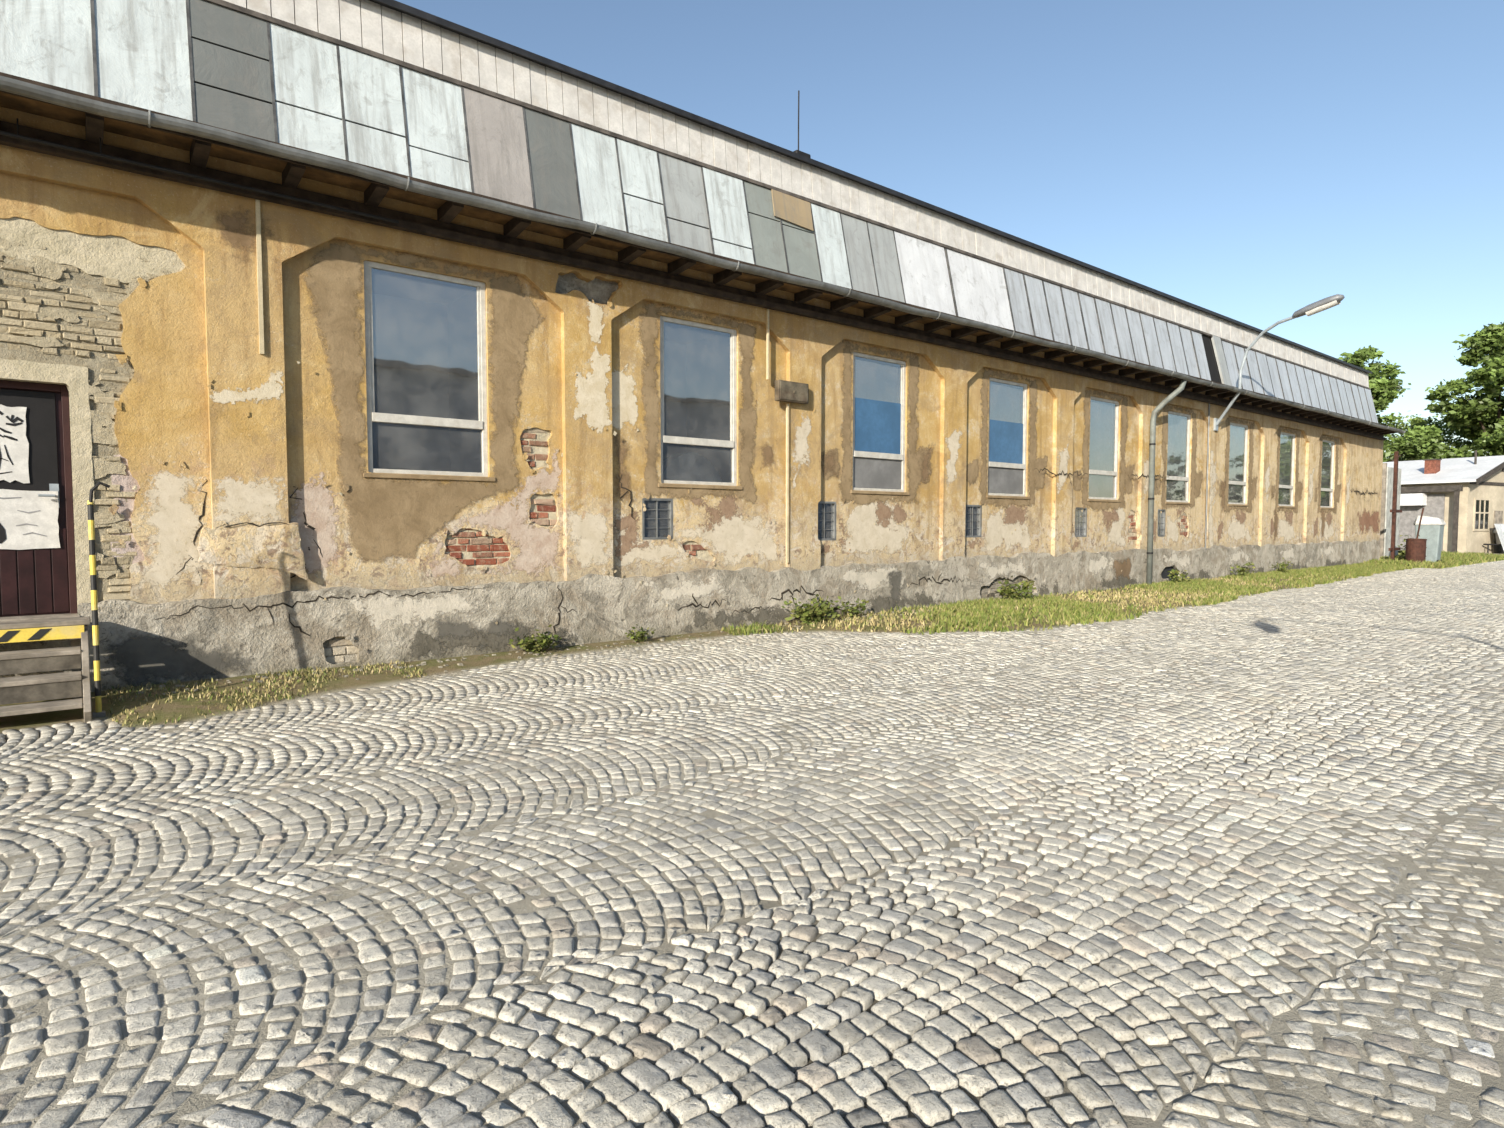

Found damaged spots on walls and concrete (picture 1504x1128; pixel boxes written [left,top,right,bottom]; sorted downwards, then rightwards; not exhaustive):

flaking render [0,217,350,608]
peeling [555,273,639,436]
crack [155,479,484,636]
peeling [324,428,783,629]
spalling [323,633,364,668]